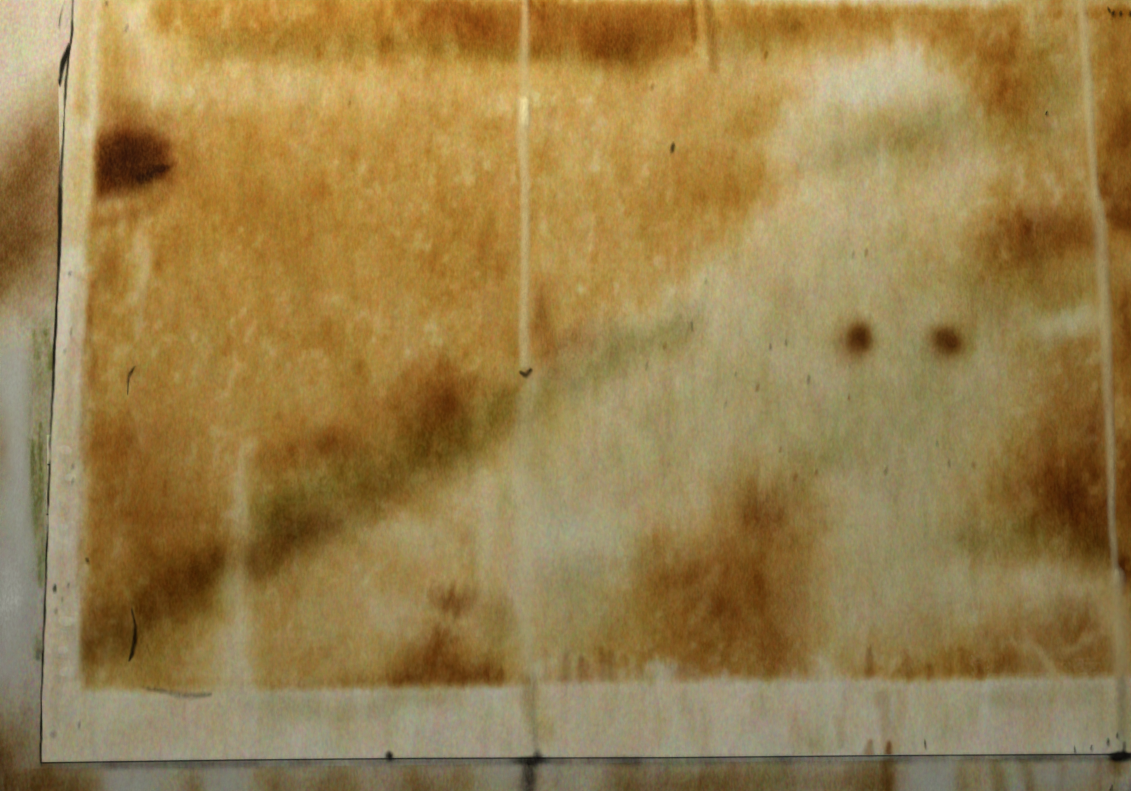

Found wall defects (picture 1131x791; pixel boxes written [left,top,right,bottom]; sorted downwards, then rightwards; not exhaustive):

leakage [530,5,689,62]
rust [98,127,171,194]
rust [849,326,869,350]
rust [935,330,958,352]